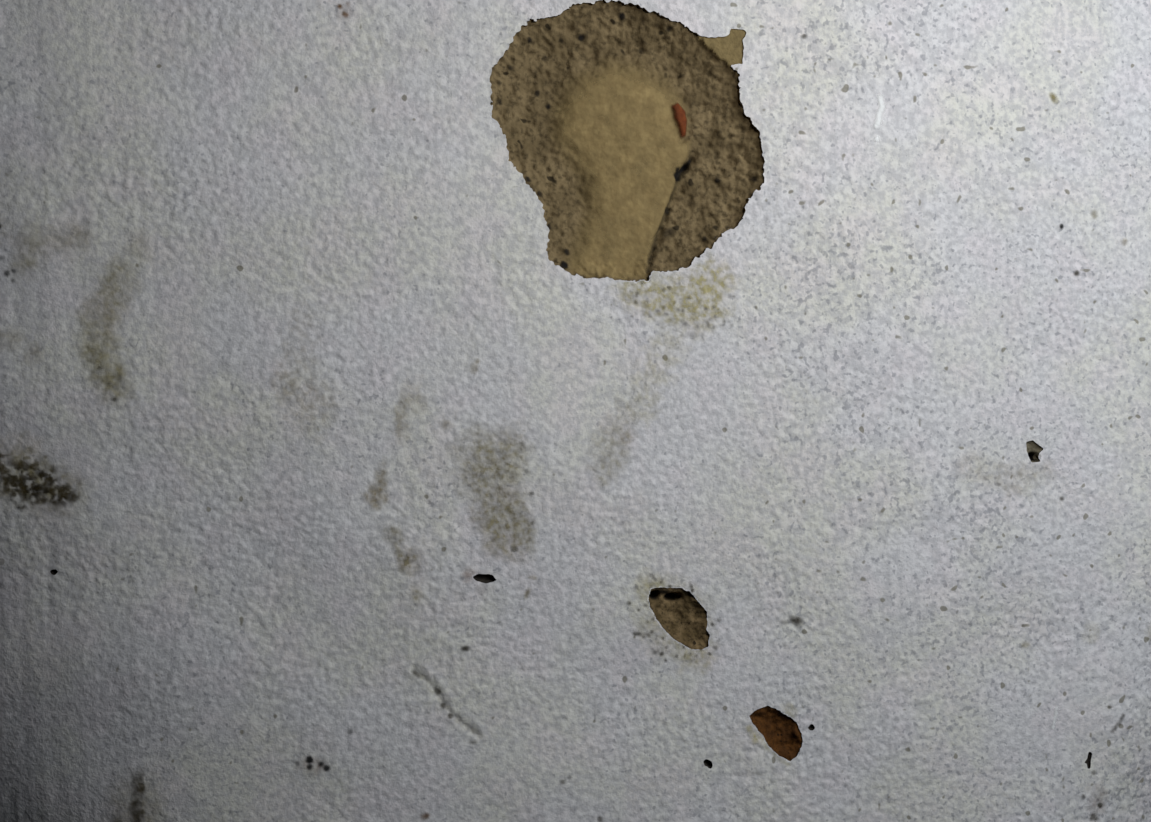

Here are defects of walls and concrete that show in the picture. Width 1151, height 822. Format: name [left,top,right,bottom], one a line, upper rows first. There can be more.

spalling [490,0,765,282]
leakage [0,454,77,508]
leakage [474,444,531,552]
peeling [1026,440,1043,462]
spalling [649,587,710,650]
spalling [749,706,815,761]